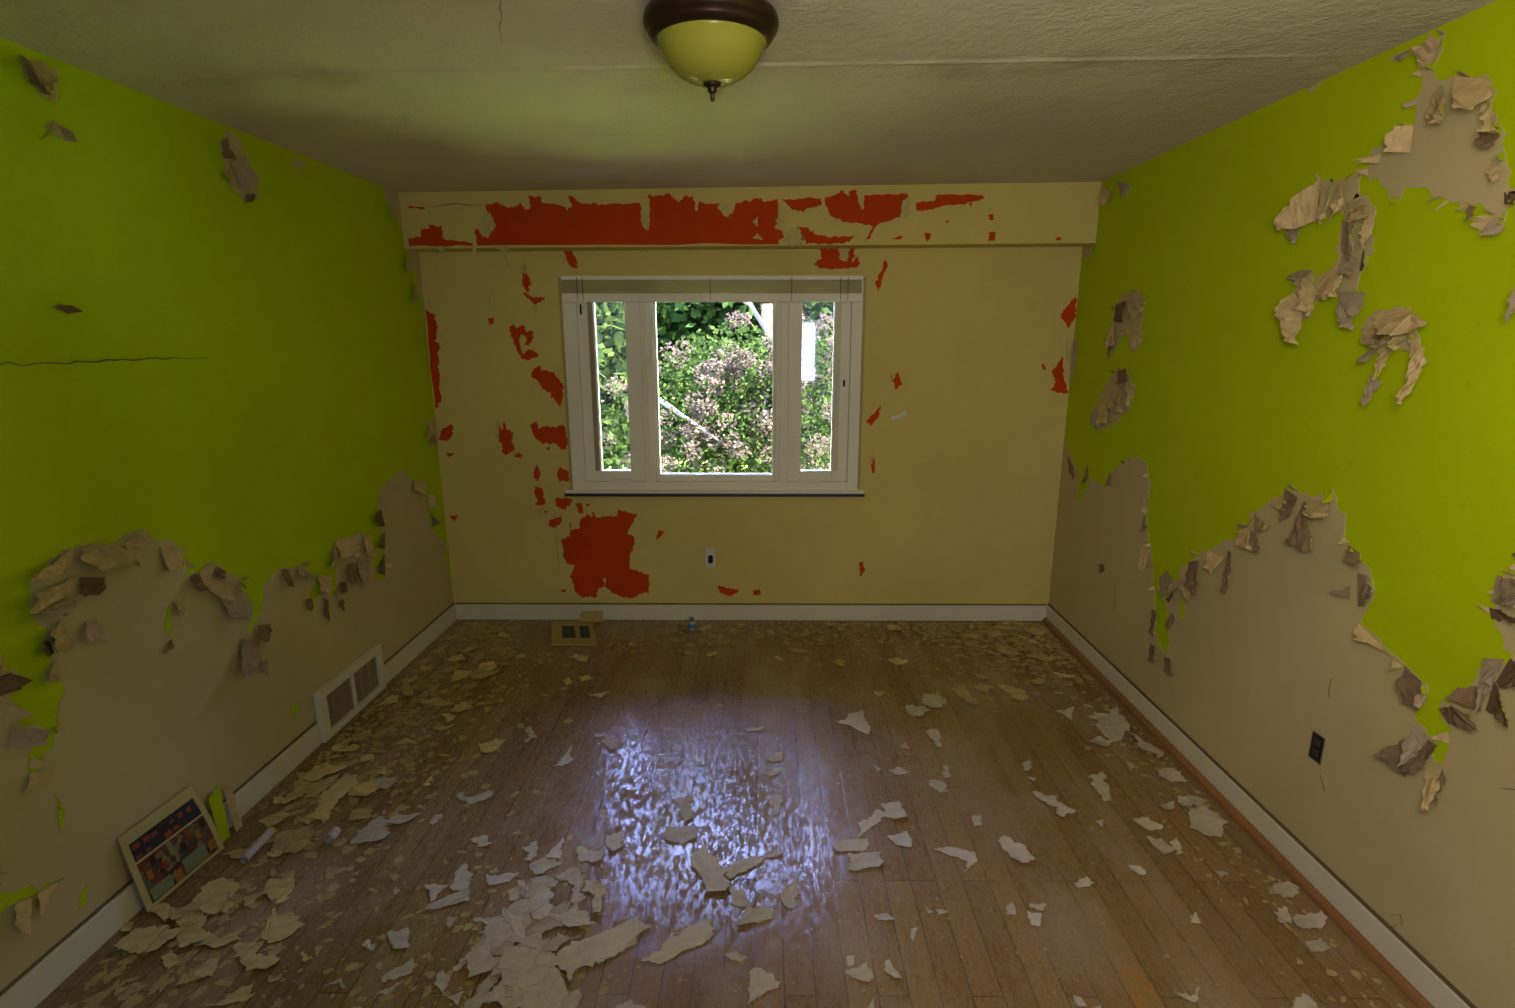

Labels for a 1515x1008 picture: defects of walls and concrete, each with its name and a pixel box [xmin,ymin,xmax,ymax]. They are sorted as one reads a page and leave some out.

peeling [18,55,61,102]
peeling [39,121,77,142]
peeling [219,131,259,203]
peeling [1274,29,1515,407]
peeling [384,188,995,457]
crack [0,357,208,366]
peeling [494,421,650,622]
peeling [717,585,761,597]
peeling [0,469,458,1006]
peeling [1049,435,1515,1008]
peeling [1022,760,1076,818]
peeling [1006,903,1047,926]